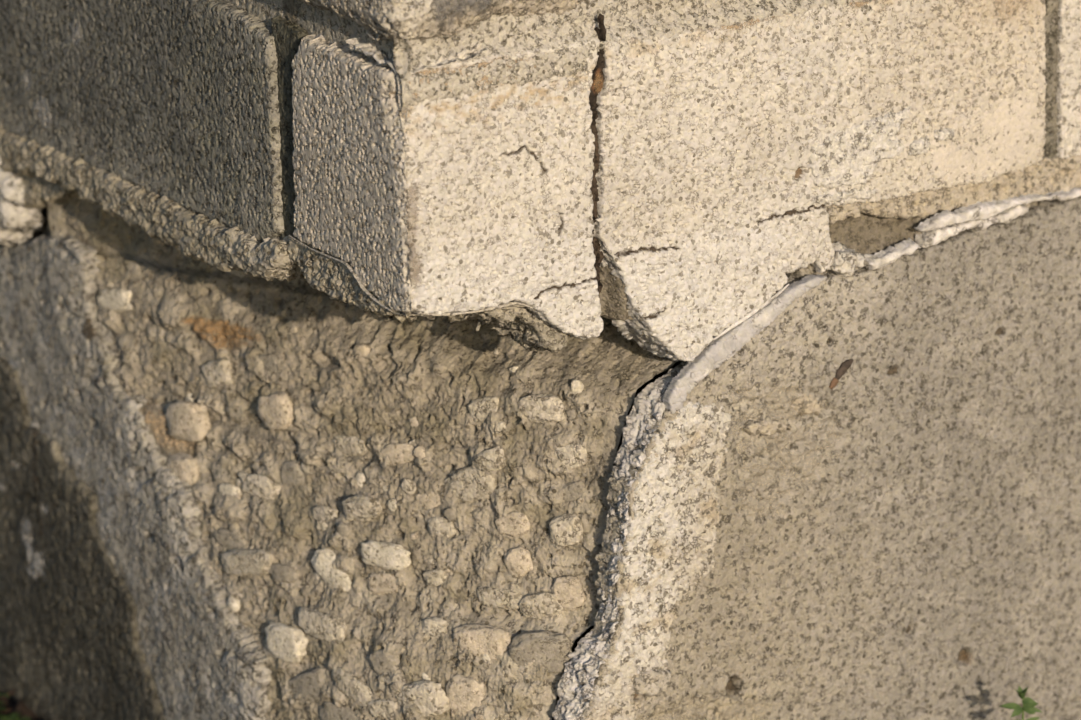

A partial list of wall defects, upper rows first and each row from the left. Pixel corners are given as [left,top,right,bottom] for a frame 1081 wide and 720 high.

peeling [908,127,954,156]
crack [504,146,547,172]
crack [534,14,679,299]
crack [757,204,825,223]
spalling [18,174,1081,720]